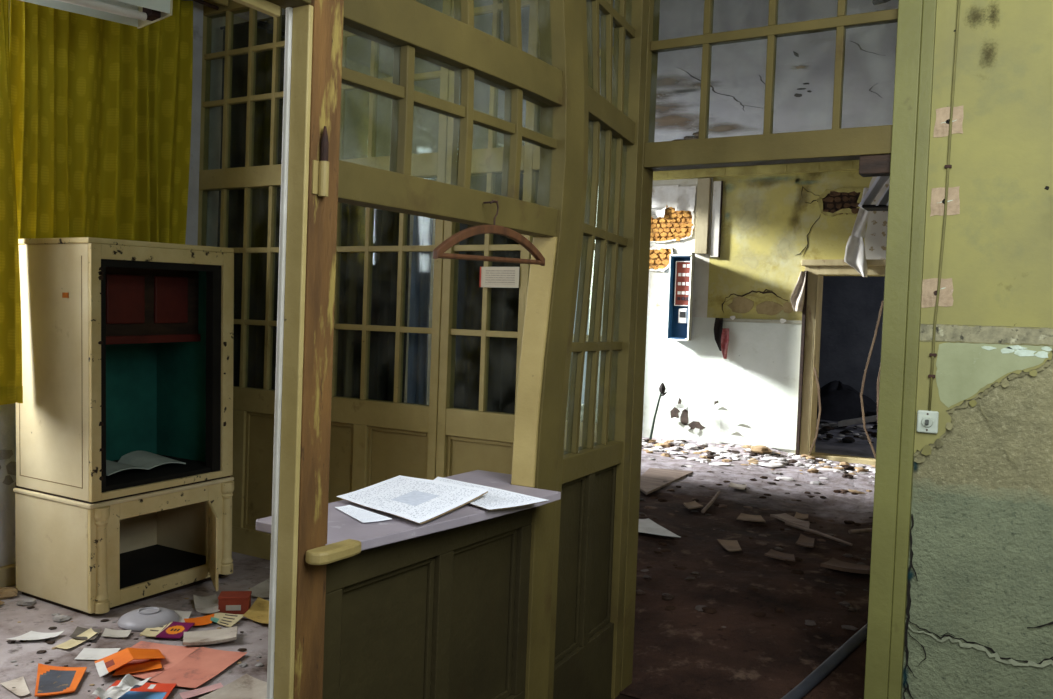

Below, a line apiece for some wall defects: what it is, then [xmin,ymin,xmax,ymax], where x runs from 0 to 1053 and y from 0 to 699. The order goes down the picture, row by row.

leakage [655,77,701,129]
leakage [708,125,742,133]
crack [797,186,820,255]
spalling [817,187,864,216]
spalling [902,324,1053,699]
crack [903,514,1053,699]